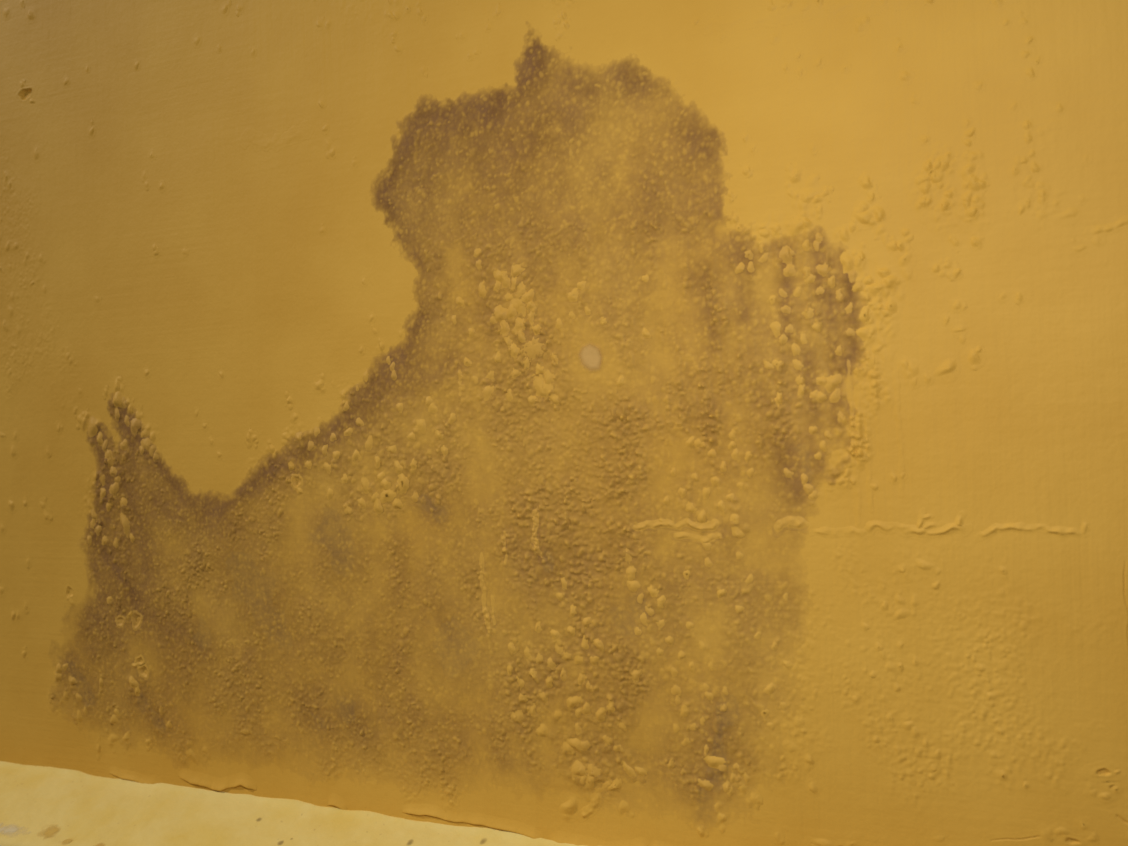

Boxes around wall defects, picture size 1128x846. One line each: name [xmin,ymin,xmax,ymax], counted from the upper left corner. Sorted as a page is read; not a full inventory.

leakage [377,42,546,221]
leakage [118,407,286,517]